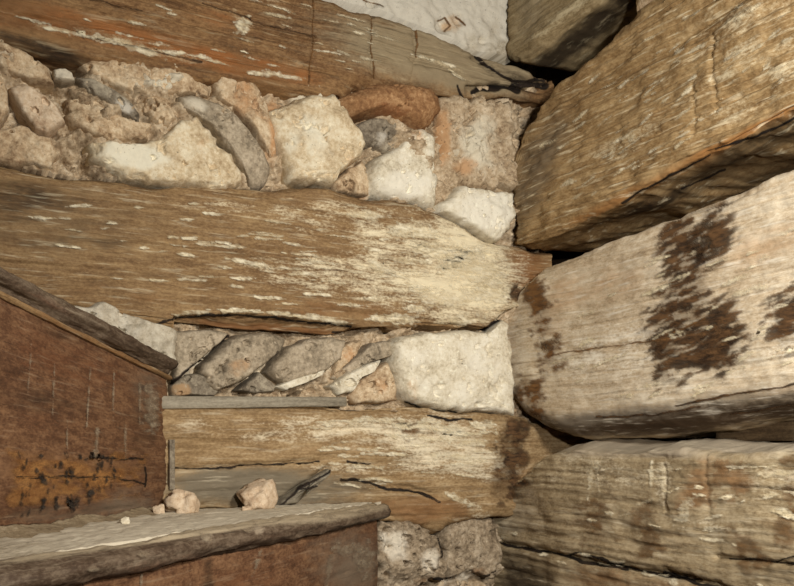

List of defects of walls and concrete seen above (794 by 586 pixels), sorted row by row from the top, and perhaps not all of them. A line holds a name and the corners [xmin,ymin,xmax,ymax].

crack [621,117,794,204]
crack [405,401,473,421]
crack [596,383,794,418]
crack [175,460,441,505]
crack [501,542,717,586]
crack [729,556,794,565]